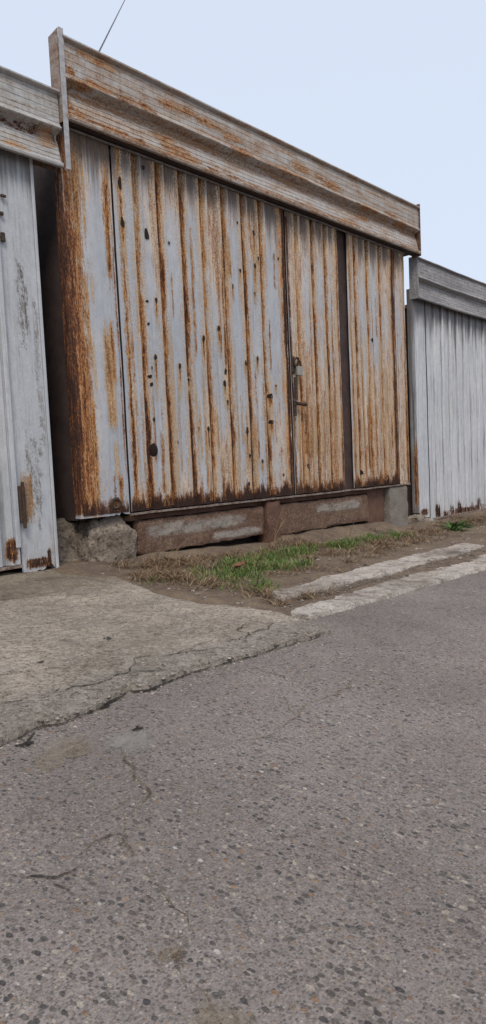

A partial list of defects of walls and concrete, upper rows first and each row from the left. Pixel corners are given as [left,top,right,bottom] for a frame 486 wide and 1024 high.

corrosion [0,46,486,523]
corrosion [5,538,52,570]
crack [3,621,352,746]